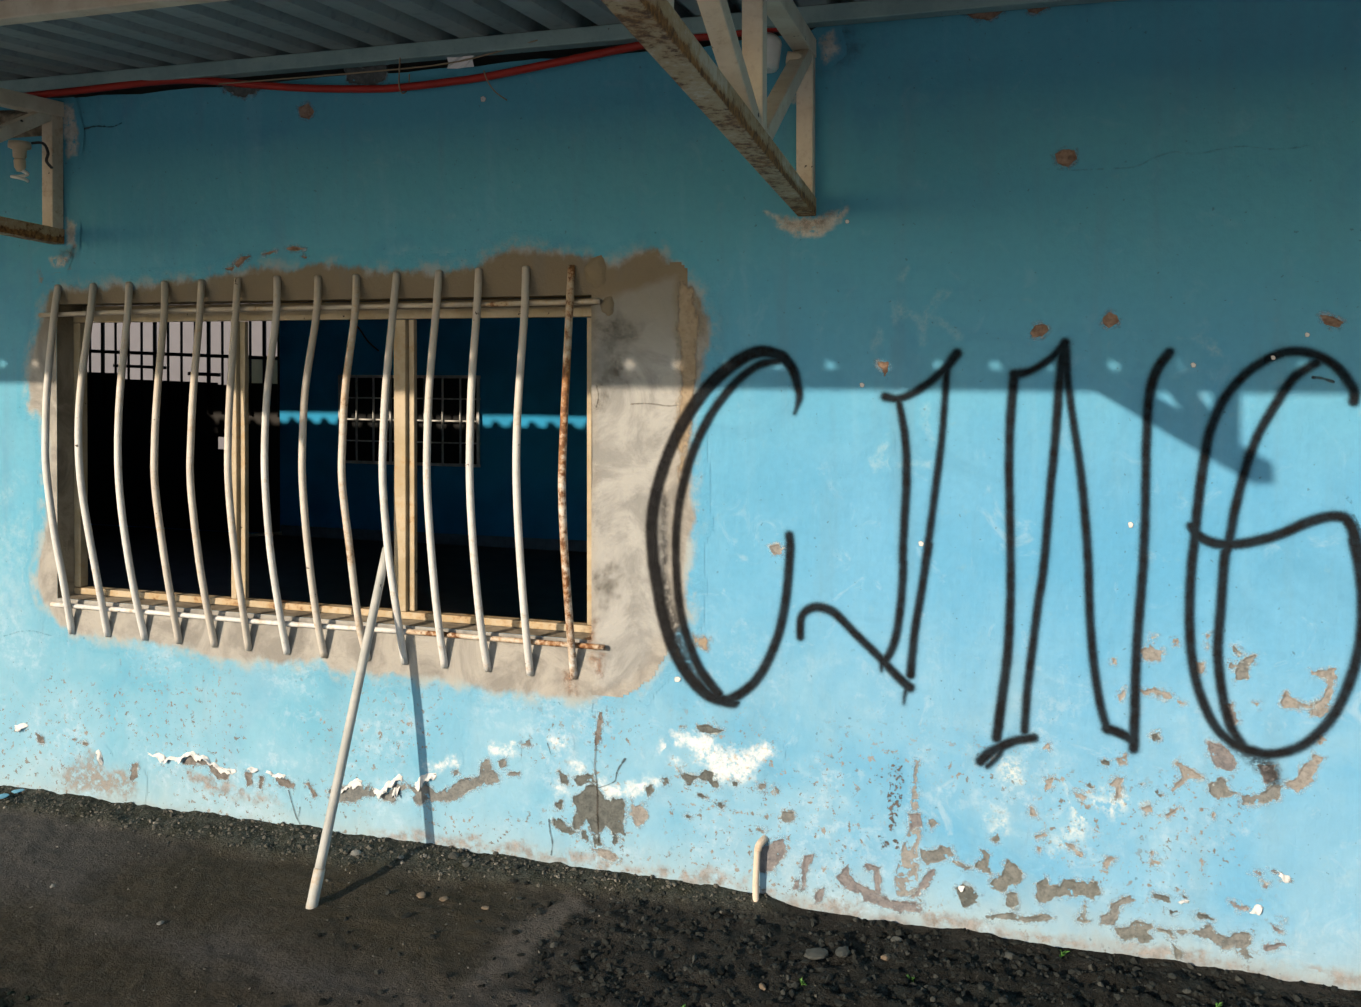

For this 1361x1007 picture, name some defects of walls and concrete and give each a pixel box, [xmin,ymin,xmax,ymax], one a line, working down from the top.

peeling [1141,635,1179,662]
peeling [1227,645,1257,680]
peeling [1278,667,1337,718]
peeling [14,723,44,744]
peeling [679,723,724,734]
peeling [130,751,521,806]
crack [593,712,626,843]
peeling [1074,752,1127,803]
peeling [1140,737,1327,819]
peeling [552,769,738,864]
peeling [756,810,796,875]
peeling [792,760,1292,959]